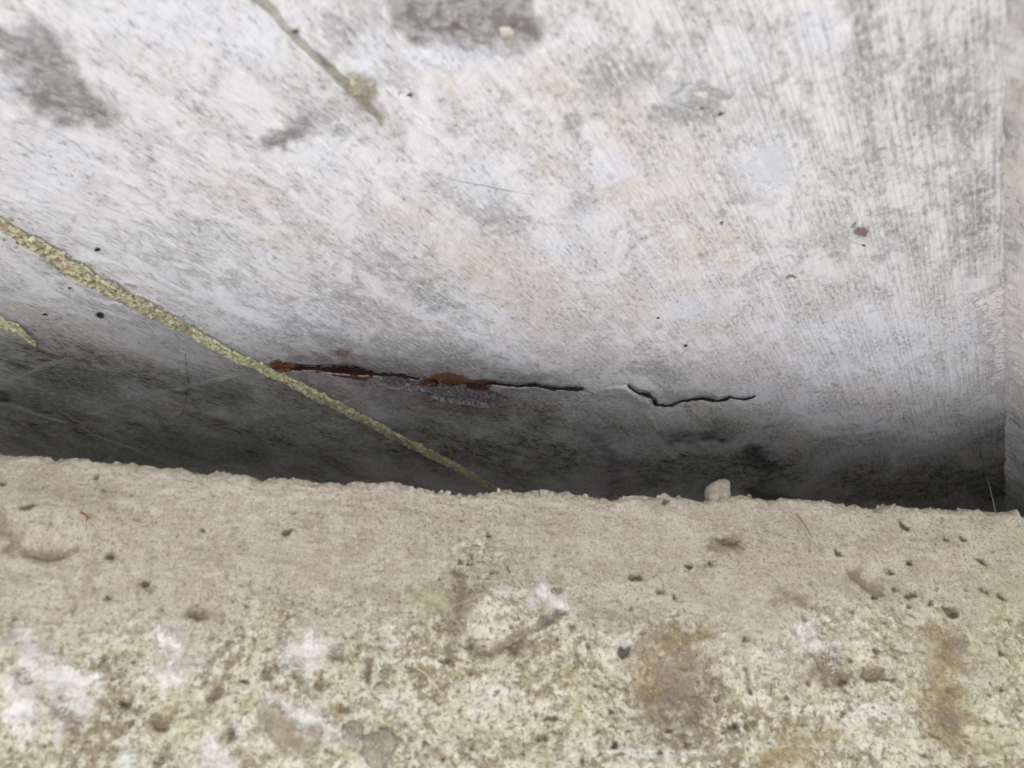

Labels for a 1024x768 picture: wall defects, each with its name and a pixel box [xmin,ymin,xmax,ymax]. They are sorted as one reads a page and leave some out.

rust [269,359,299,372]
crack [291,366,419,380]
rust [419,373,495,391]
crack [484,382,755,407]